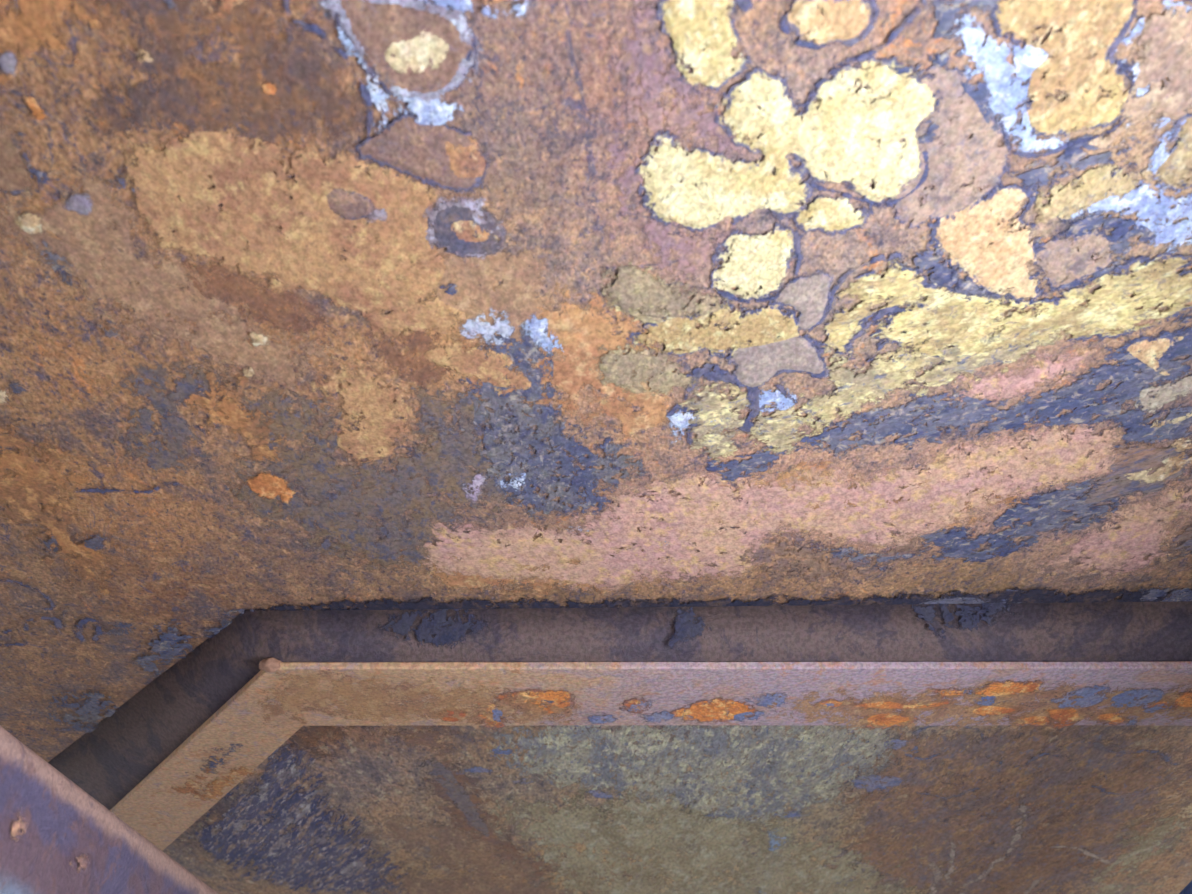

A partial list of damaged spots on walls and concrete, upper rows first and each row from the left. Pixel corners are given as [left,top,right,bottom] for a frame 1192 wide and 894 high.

peeling [0,51,18,76]
peeling [14,213,42,235]
peeling [63,193,93,216]
corrosion [0,0,390,511]
corrosion [362,185,679,441]
peeling [109,0,1192,591]
corrosion [0,418,119,599]
corrosion [750,461,863,515]
corrosion [924,471,1022,529]
corrosion [257,669,580,731]
corrosion [666,678,1192,733]